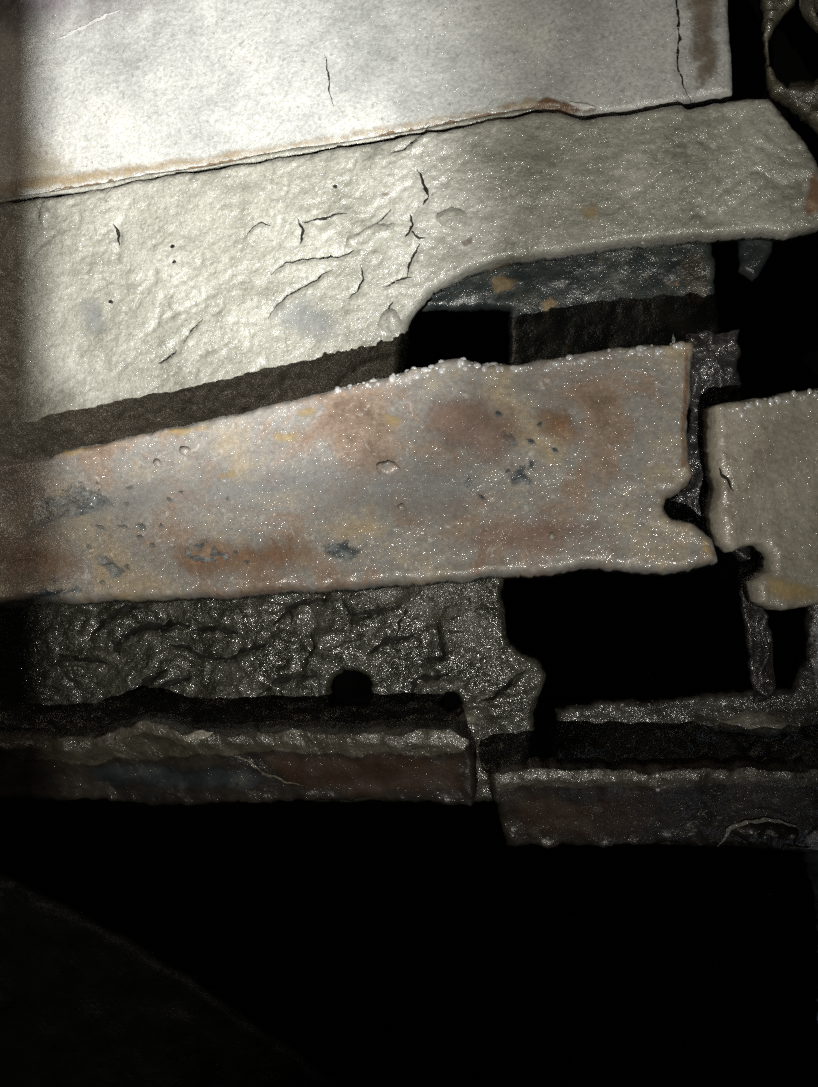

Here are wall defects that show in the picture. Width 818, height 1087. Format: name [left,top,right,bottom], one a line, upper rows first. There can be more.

crack [675,0,691,102]
corrosion [689,0,716,84]
crack [112,224,120,245]
crack [269,125,430,317]
crack [158,319,203,364]
peeling [666,329,742,534]
peeling [506,462,533,484]
peeling [33,482,133,530]
peeling [86,545,130,585]
corrosion [176,542,310,575]
peeling [325,539,359,561]
peeling [731,546,776,704]